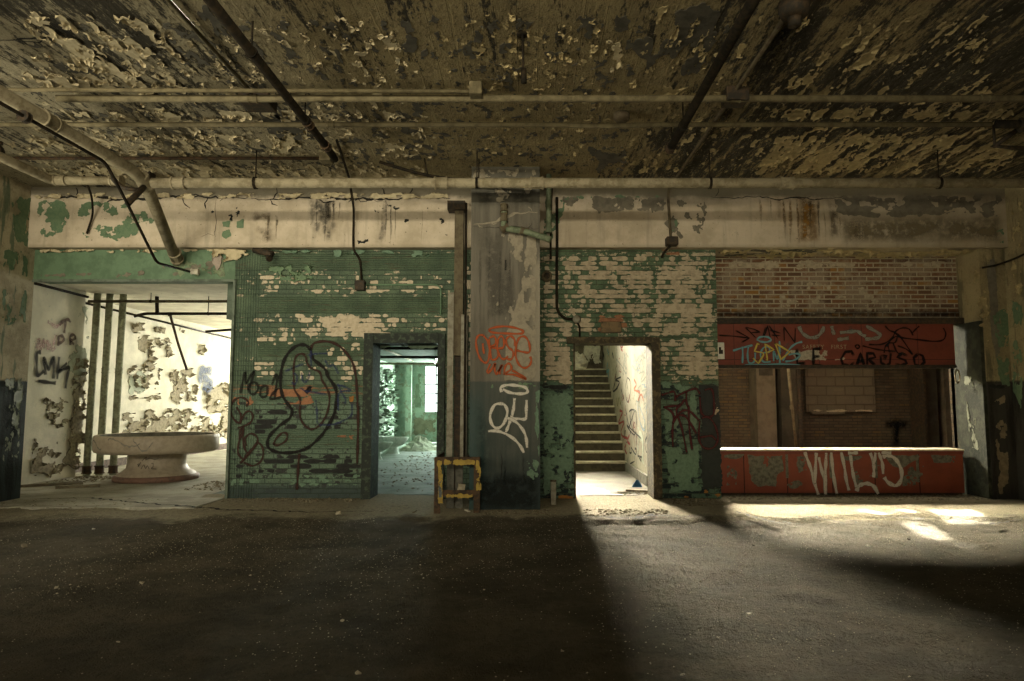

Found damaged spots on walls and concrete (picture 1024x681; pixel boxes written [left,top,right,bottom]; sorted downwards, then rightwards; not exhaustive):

peeling [7,2,1017,178]
peeling [2,289,27,325]
peeling [30,306,89,478]
peeling [3,193,154,277]
peeling [122,314,405,438]
water stain [314,202,340,236]
peeling [258,239,450,293]
peeling [276,192,448,235]
peeling [491,194,867,499]
peeling [996,420,1009,494]